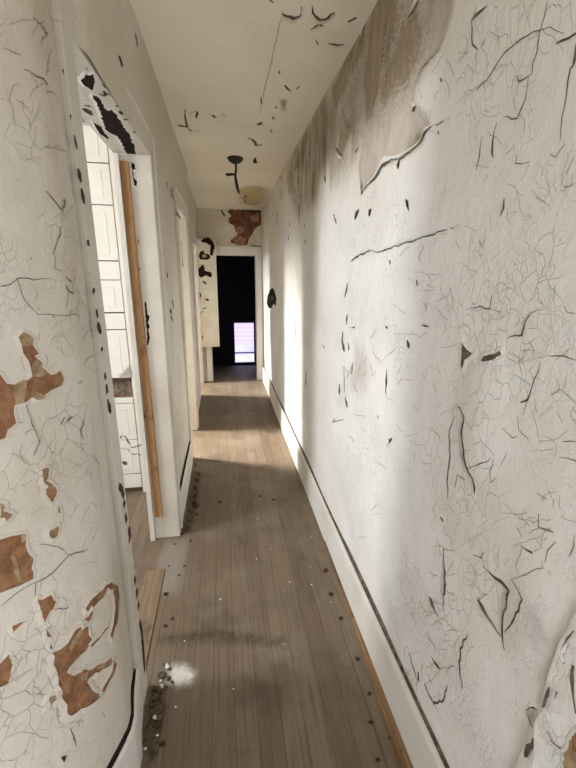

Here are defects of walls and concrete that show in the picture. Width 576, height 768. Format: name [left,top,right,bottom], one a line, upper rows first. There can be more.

spalling [77,68,139,189]
crack [248,0,357,146]
leakage [334,0,451,188]
peeling [0,327,66,444]
peeling [198,237,217,313]
spalling [267,287,277,309]
crack [322,283,441,421]
crack [349,3,576,709]
peeling [0,498,38,597]
crack [4,404,103,604]
peeling [6,577,120,724]
crack [524,665,576,761]